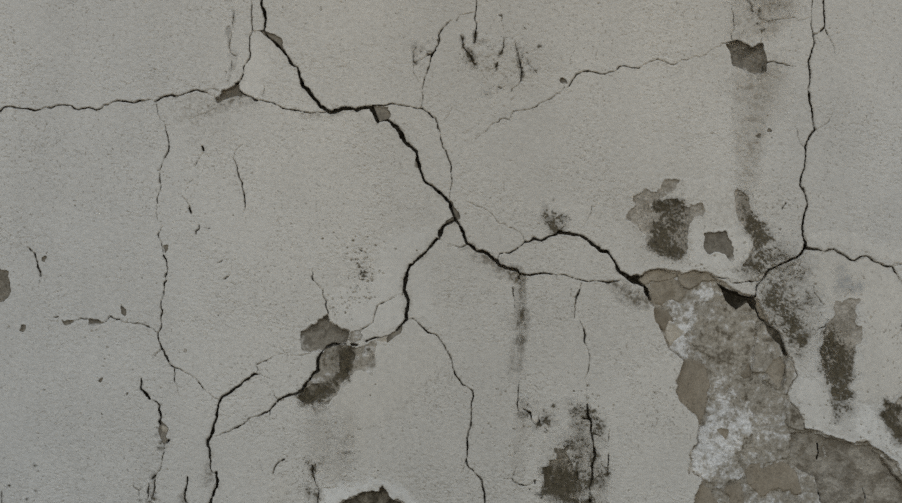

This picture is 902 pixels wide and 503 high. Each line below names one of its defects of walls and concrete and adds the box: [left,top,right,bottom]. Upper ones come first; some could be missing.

crack [475,12,734,140]
spalling [726,40,767,74]
crack [717,0,902,298]
crack [0,0,630,503]
peeling [626,179,705,259]
peeling [704,188,763,267]
damp [732,191,855,424]
spalling [299,314,402,405]
spalling [341,486,404,503]
damp [540,403,611,503]
spalling [624,268,902,503]
damp [879,398,902,445]